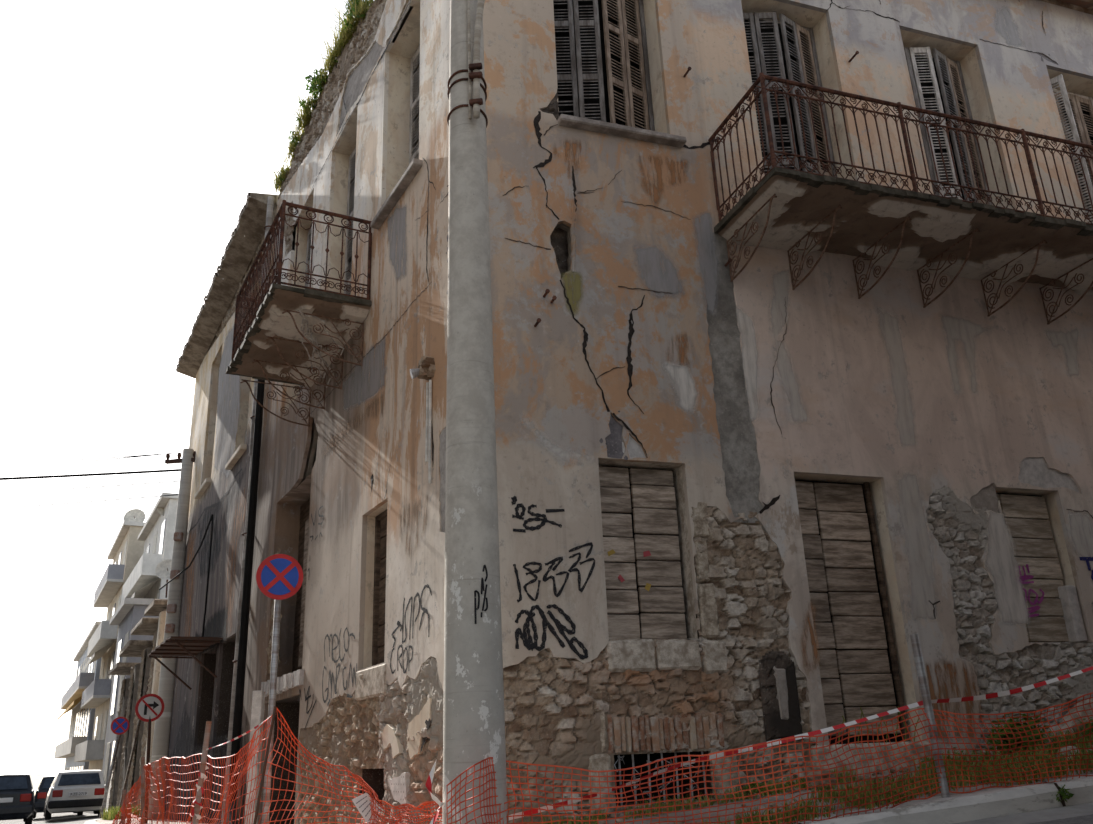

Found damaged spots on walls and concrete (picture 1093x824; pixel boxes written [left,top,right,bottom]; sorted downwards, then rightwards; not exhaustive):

flaking render [339,0,410,129]
crack [826,0,899,22]
crack [503,111,691,220]
water stain [388,207,406,278]
crack [560,280,672,458]
peeling [706,232,764,523]
crack [770,301,787,434]
flaking render [381,698,432,759]
flaking render [388,772,411,808]